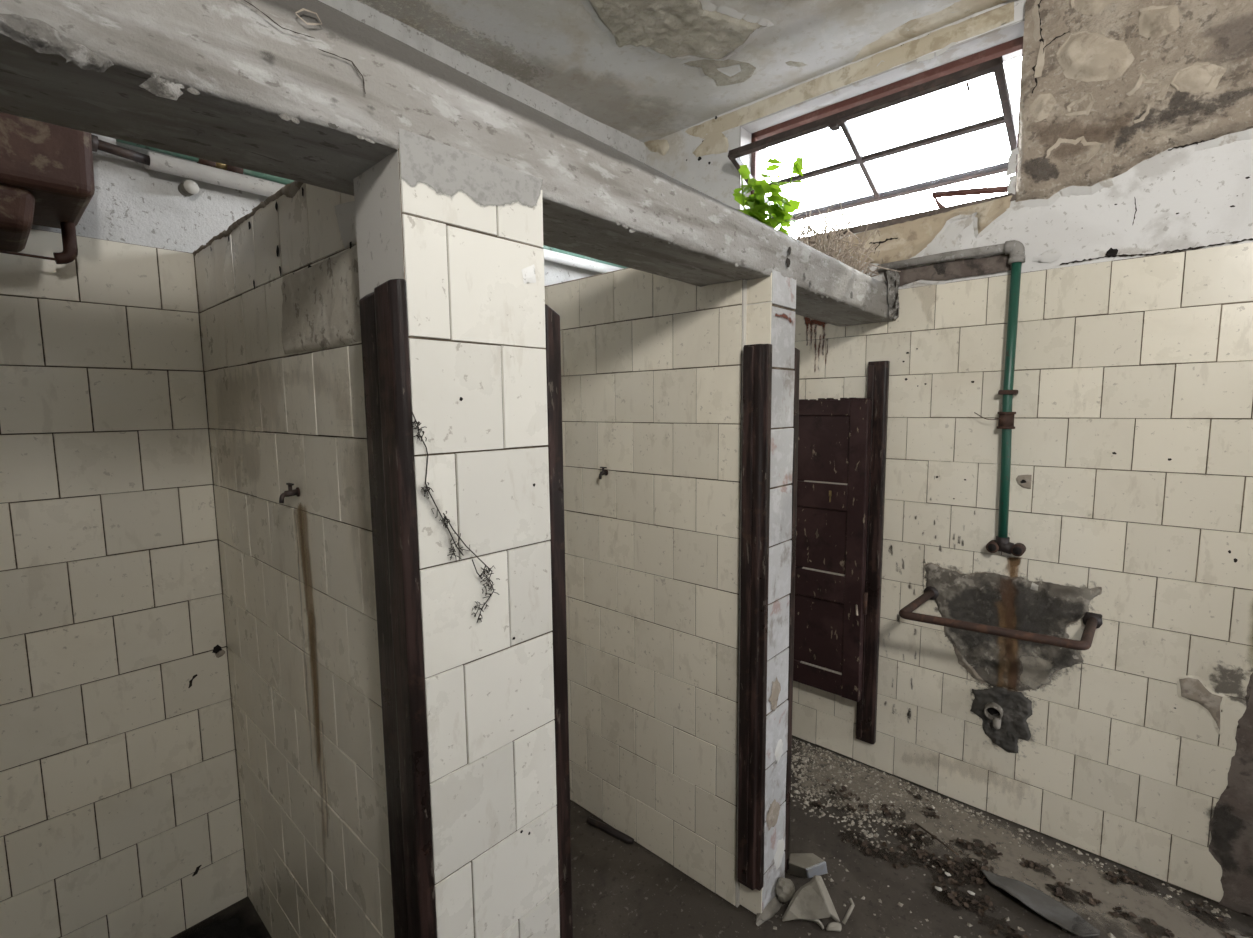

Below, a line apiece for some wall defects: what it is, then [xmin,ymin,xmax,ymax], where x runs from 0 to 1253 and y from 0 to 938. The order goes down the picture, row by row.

spalling [0,13,114,72]
spalling [139,73,200,100]
spalling [278,113,300,124]
peeling [580,0,774,87]
peeling [644,0,1014,209]
water stain [1006,0,1253,211]
rust [775,313,828,370]
water stain [297,505,325,780]
rust [998,558,1021,689]
peeling [923,563,1102,753]
peeling [1174,665,1253,917]